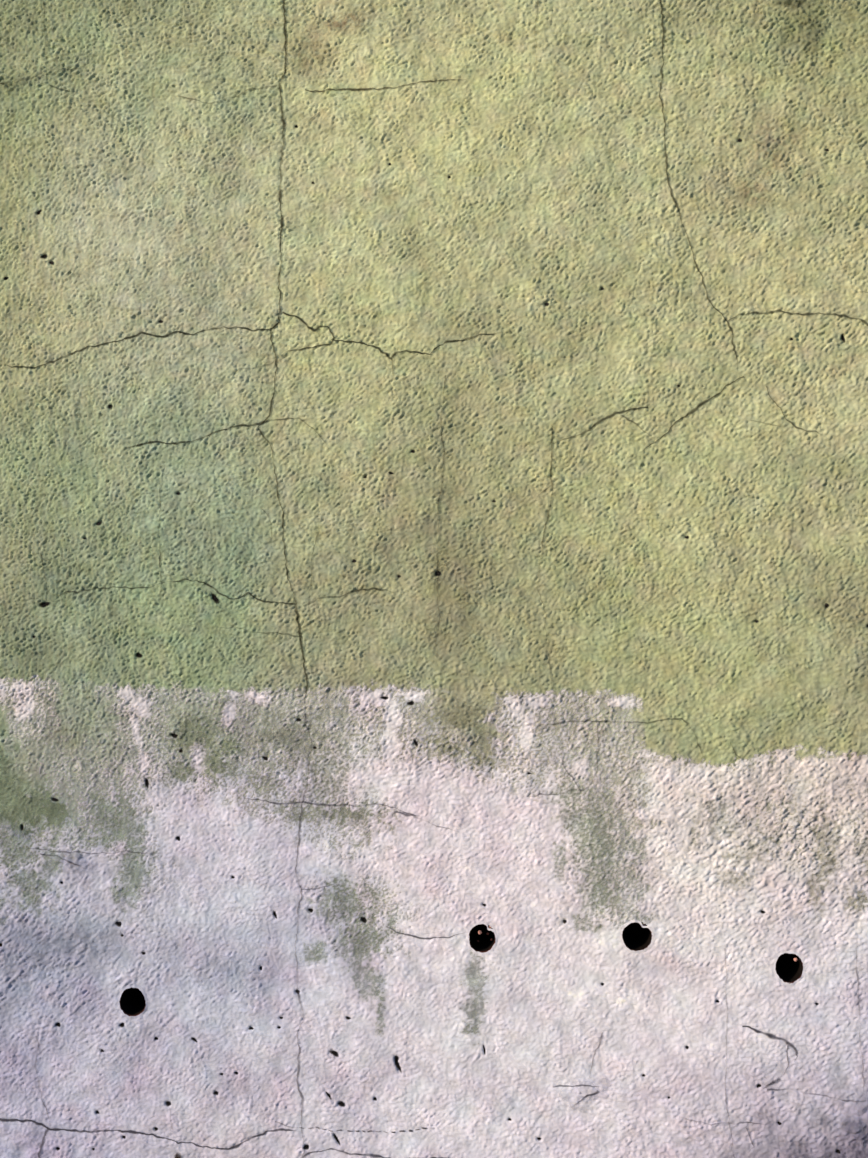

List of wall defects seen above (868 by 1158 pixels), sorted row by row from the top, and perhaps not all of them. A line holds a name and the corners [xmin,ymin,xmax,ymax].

crack [542,0,868,542]
crack [9,0,496,742]
crack [246,798,347,940]
crack [388,927,461,939]
crack [0,1032,427,1158]
crack [554,1035,602,1104]
crack [742,1026,797,1090]